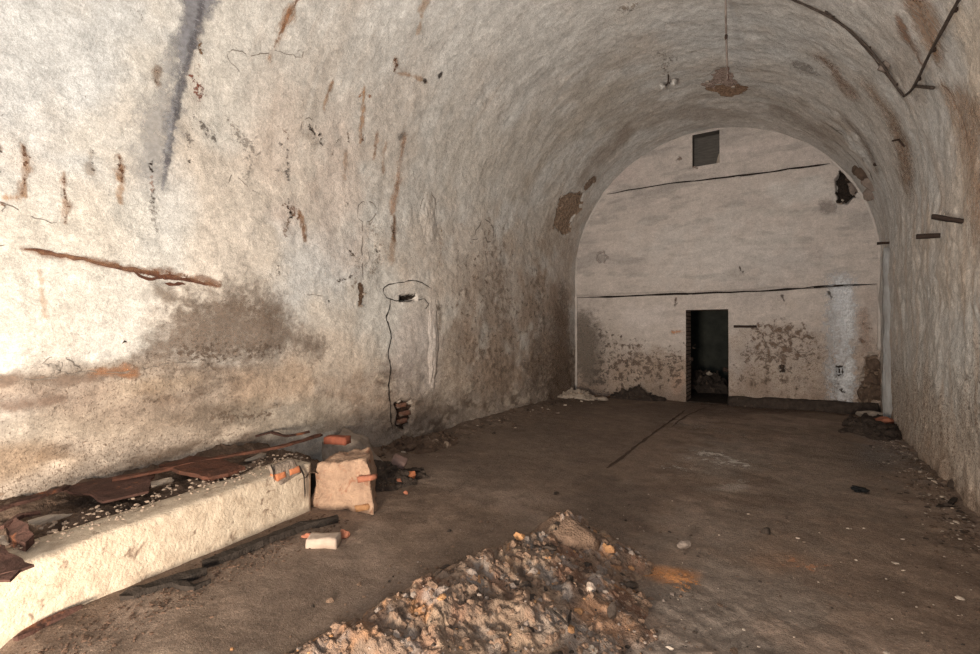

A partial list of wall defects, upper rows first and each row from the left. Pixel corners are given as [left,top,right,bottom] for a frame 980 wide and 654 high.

corrosion [280,0,298,33]
corrosion [1,145,31,206]
spalling [835,165,875,205]
flaking render [552,176,597,235]
corrosion [39,251,221,287]
leakage [156,286,175,301]
leakage [0,289,320,410]
leakage [209,409,272,425]
spalling [394,400,413,429]